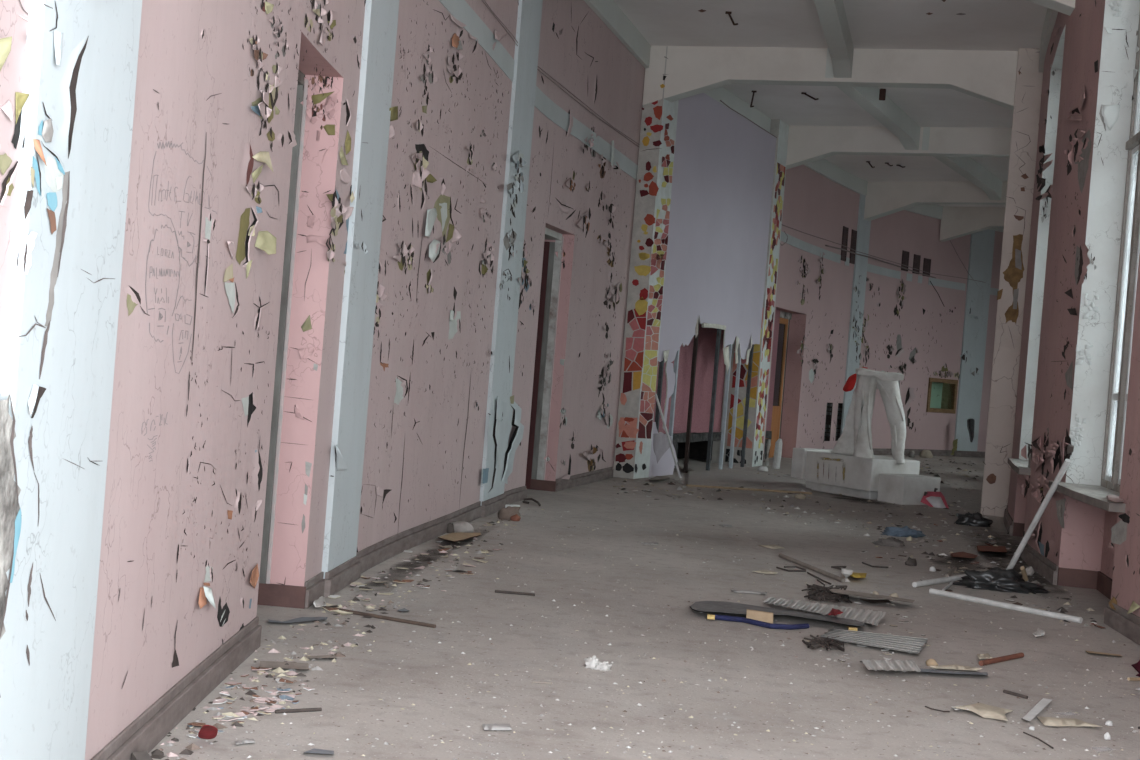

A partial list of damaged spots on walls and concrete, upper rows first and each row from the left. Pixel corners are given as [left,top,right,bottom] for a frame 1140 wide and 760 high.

peeling [0,92,66,234]
peeling [223,0,289,317]
peeling [301,76,356,273]
peeling [373,14,467,337]
peeling [1064,86,1092,194]
crack [1097,104,1120,166]
peeling [1063,209,1100,319]
peeling [483,395,525,496]
spalling [824,403,842,441]
peeling [887,334,919,431]
peeling [1051,337,1093,400]
spalling [0,394,22,639]